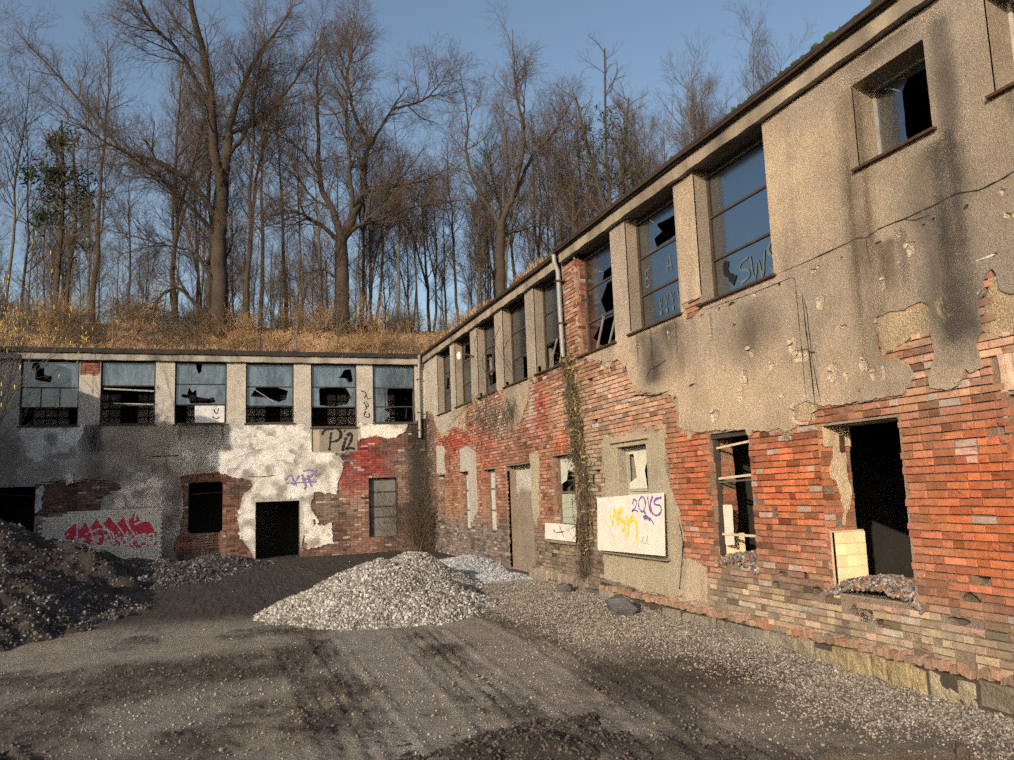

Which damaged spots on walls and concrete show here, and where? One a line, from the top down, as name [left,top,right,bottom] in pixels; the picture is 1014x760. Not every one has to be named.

spalling [34,472,165,517]
spalling [174,262,1014,678]